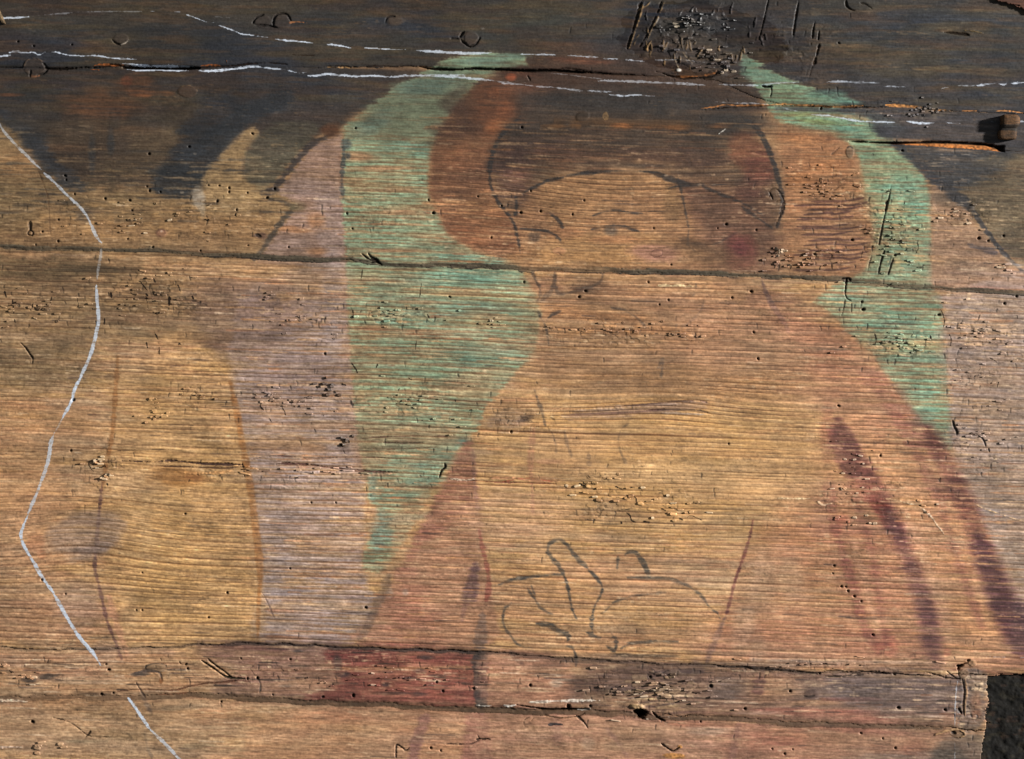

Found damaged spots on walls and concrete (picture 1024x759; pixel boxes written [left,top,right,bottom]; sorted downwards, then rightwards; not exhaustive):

crack [0,54,713,81]
crack [362,253,382,265]
crack [716,665,887,677]